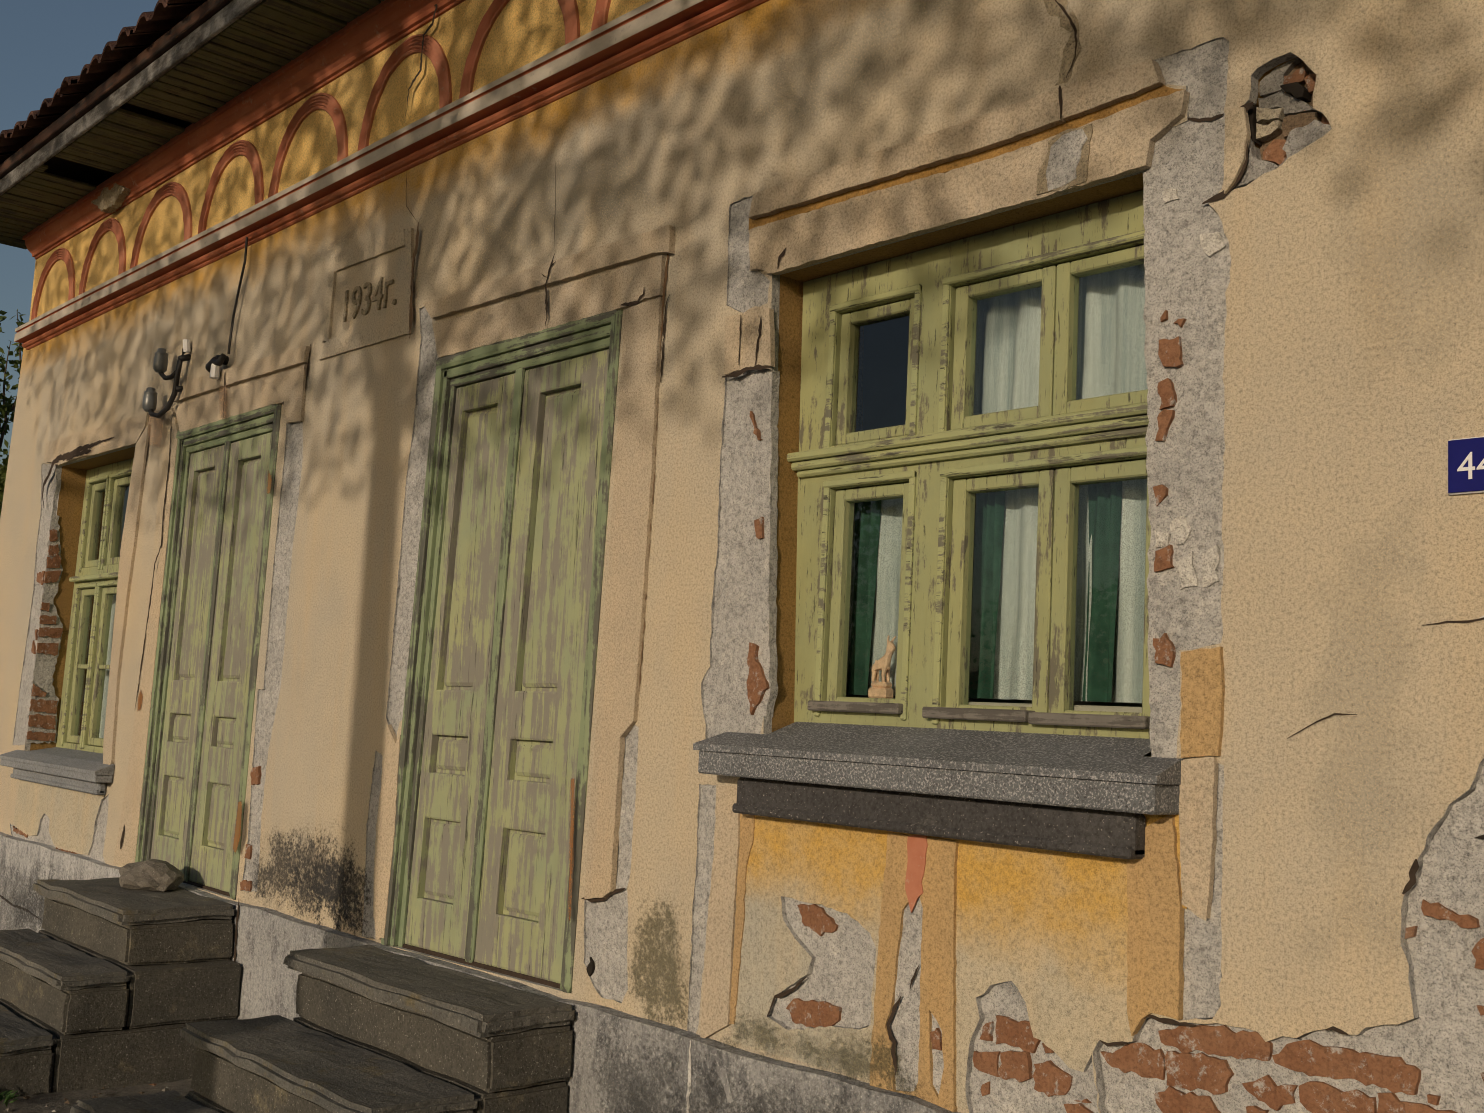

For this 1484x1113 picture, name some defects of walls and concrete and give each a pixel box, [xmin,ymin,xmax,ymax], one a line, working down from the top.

crack [1043,0,1082,121]
flaking render [1143,38,1332,758]
flaking render [13,464,63,745]
flaking render [703,370,780,738]
water stain [247,827,372,933]
flaking render [771,897,876,1029]
flaking render [890,835,944,1094]
flaking render [969,763,1484,1113]